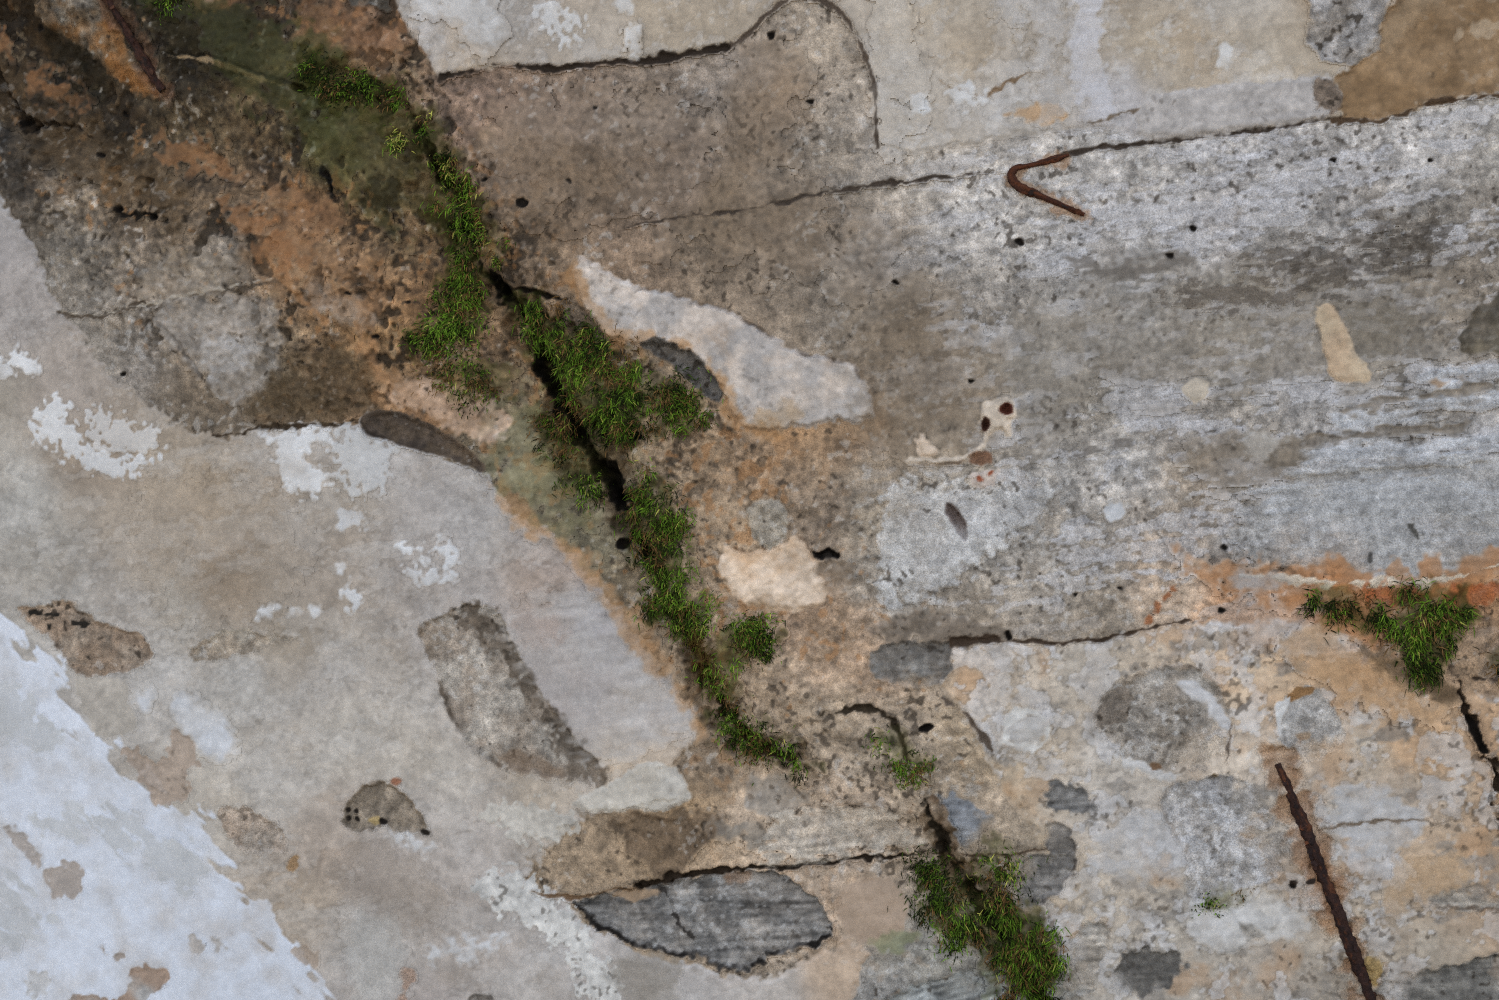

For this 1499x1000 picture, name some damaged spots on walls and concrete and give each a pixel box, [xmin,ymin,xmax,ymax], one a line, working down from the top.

crack [436,0,1007,229]
corrosion [1001,145,1095,227]
peeling [1300,0,1499,127]
water stain [133,243,289,407]
water stain [381,375,515,451]
peeling [483,254,857,452]
peeling [0,597,338,1000]
spalling [571,869,837,975]
crack [530,765,977,903]
crack [817,701,898,725]
corrosion [1255,735,1478,1000]
crack [1322,675,1499,831]